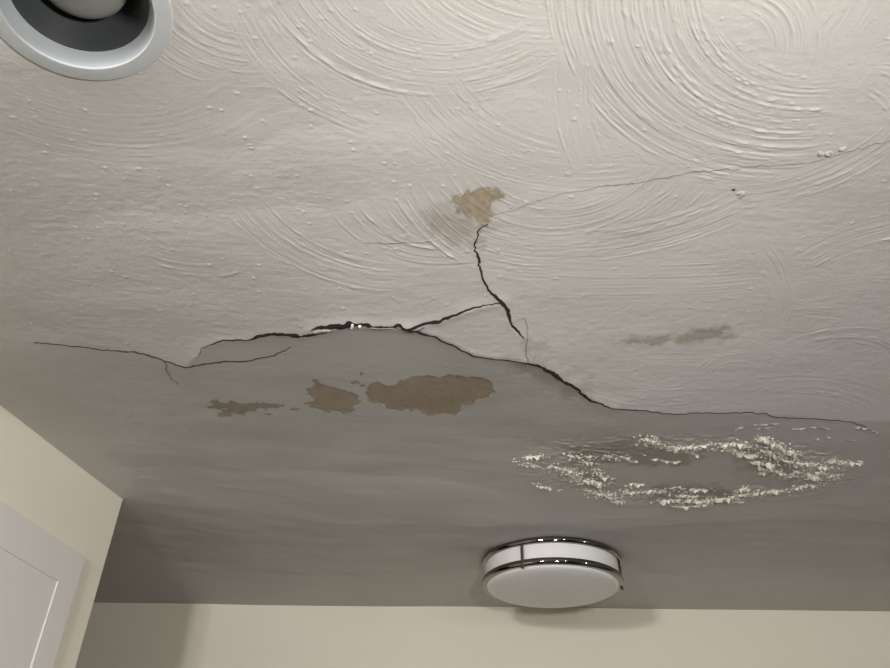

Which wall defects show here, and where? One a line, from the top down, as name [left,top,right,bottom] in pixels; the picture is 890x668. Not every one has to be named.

damp [453,187,504,225]
crack [34,141,889,428]
peeling [208,372,495,417]